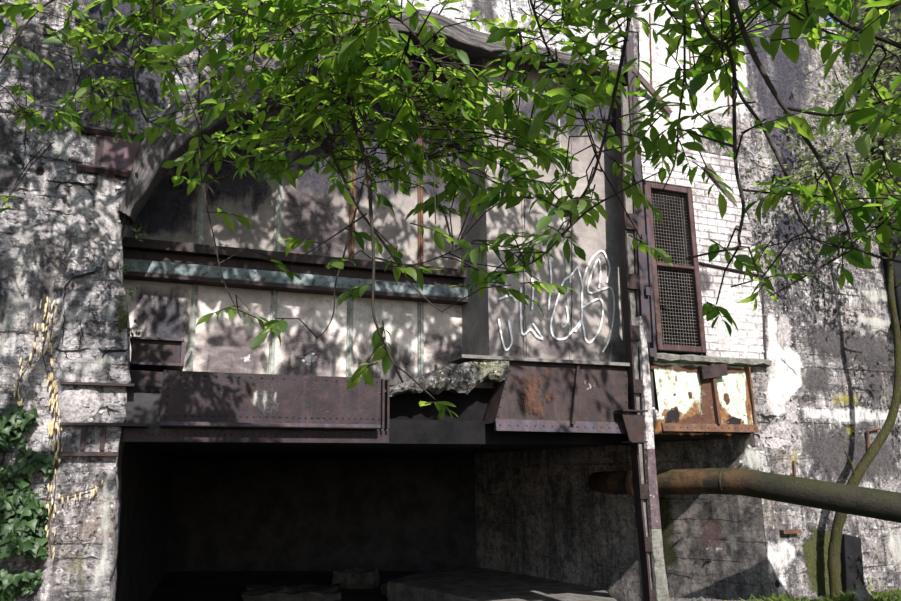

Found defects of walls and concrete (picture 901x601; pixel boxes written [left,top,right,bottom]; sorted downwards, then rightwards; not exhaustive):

damp [132,165,196,237]
damp [283,190,343,255]
crack [56,271,128,359]
damp [802,314,894,399]
corrosion [651,363,754,435]
damp [805,407,900,481]